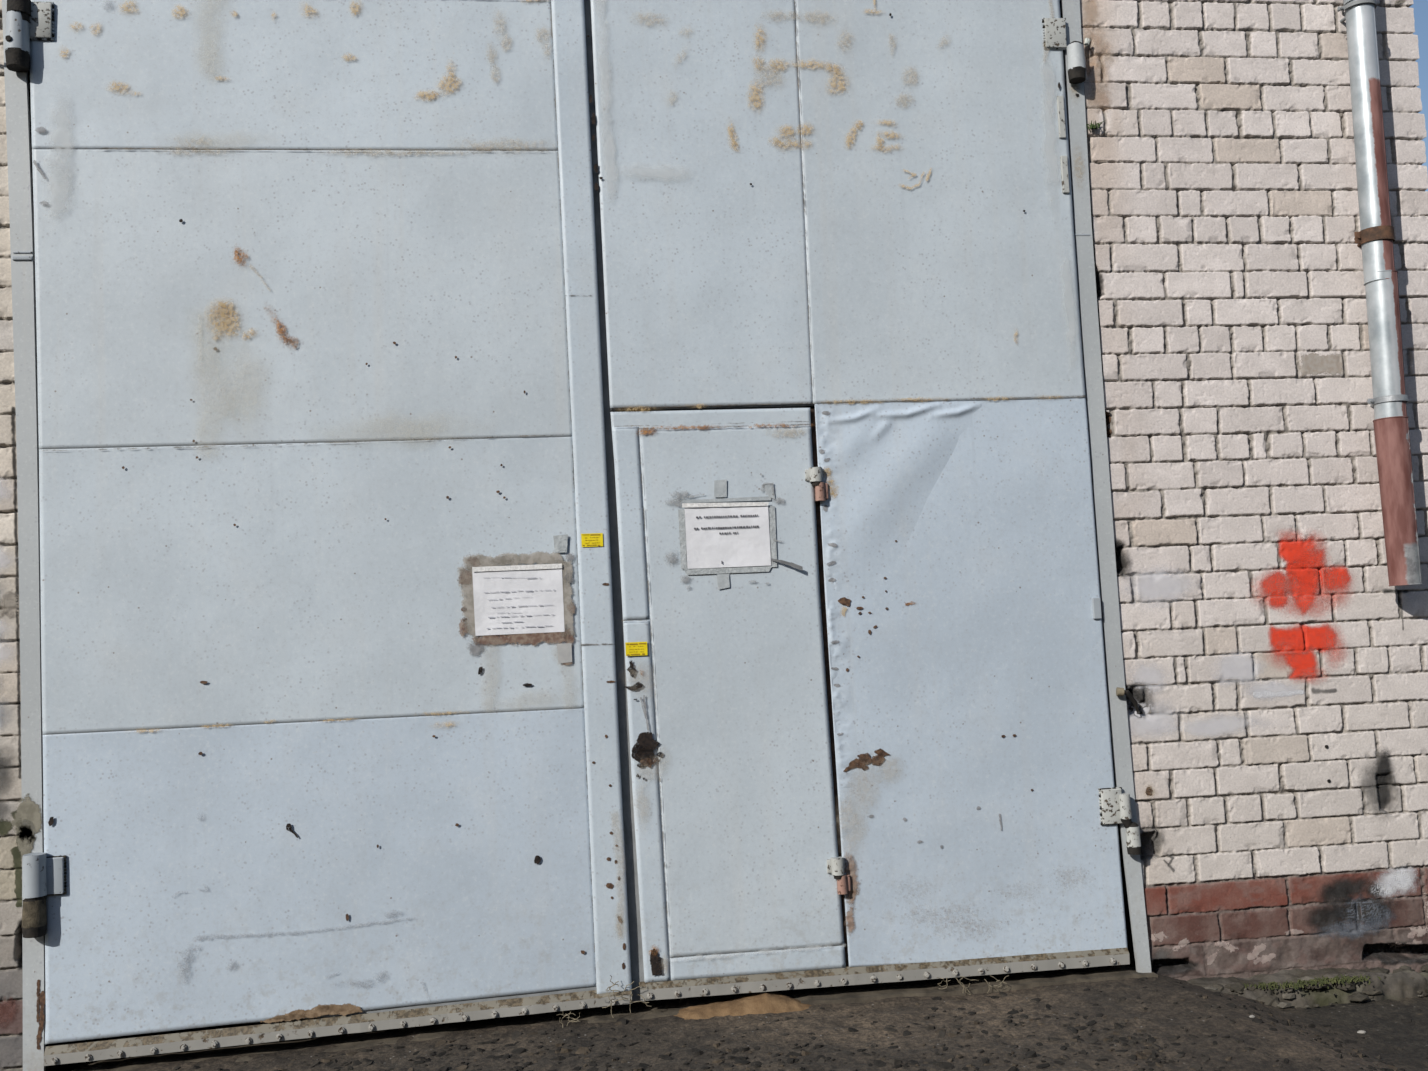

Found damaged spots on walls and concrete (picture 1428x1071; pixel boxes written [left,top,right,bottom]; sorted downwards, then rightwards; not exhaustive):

corrosion [749,29,845,107]
corrosion [274,317,298,347]
corrosion [844,854,860,932]